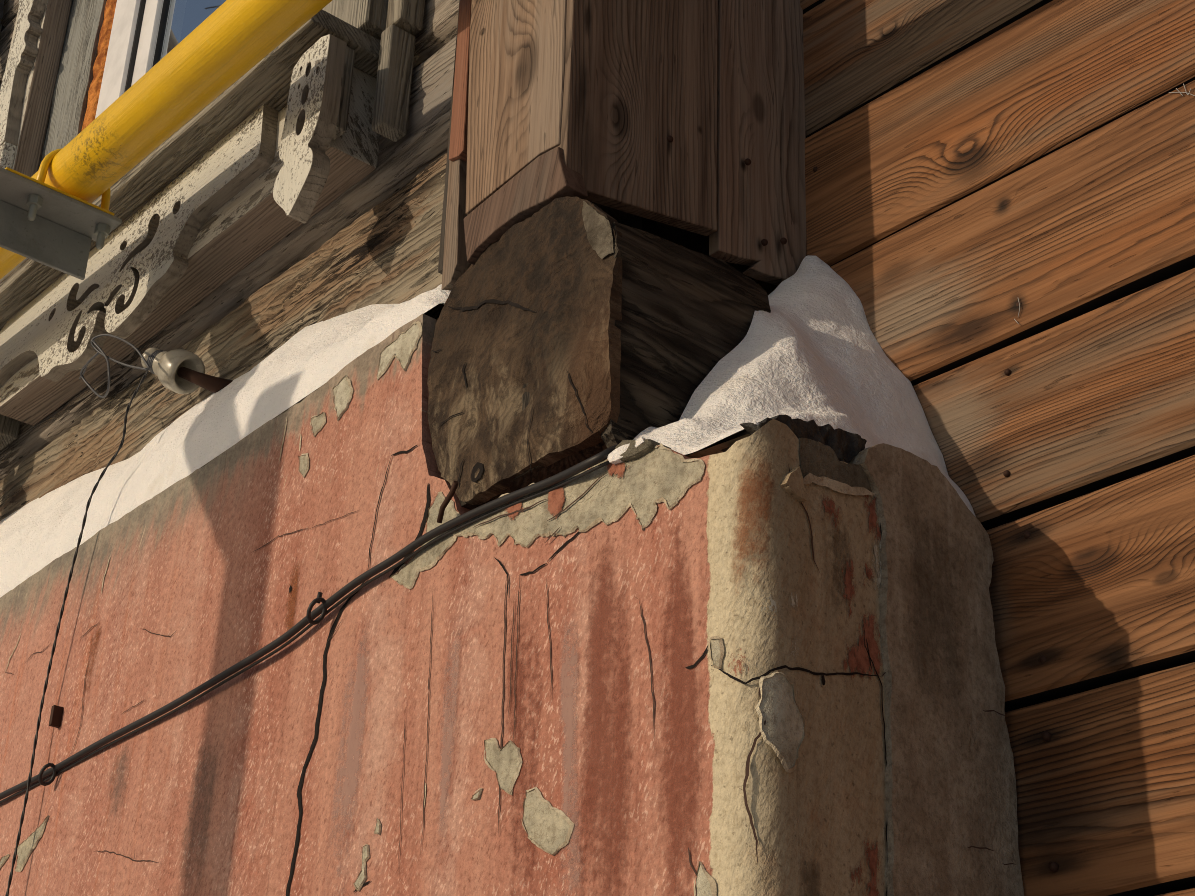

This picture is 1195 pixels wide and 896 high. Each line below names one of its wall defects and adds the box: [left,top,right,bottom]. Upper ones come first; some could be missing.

crack [432,349,467,425]
peeling [390,443,705,589]
peeling [0,815,49,872]
crack [253,445,464,896]
peeling [353,818,382,891]
peeling [484,738,574,856]
crack [474,474,605,749]
crack [634,596,655,727]
peeling [708,636,805,773]
crack [685,625,887,863]